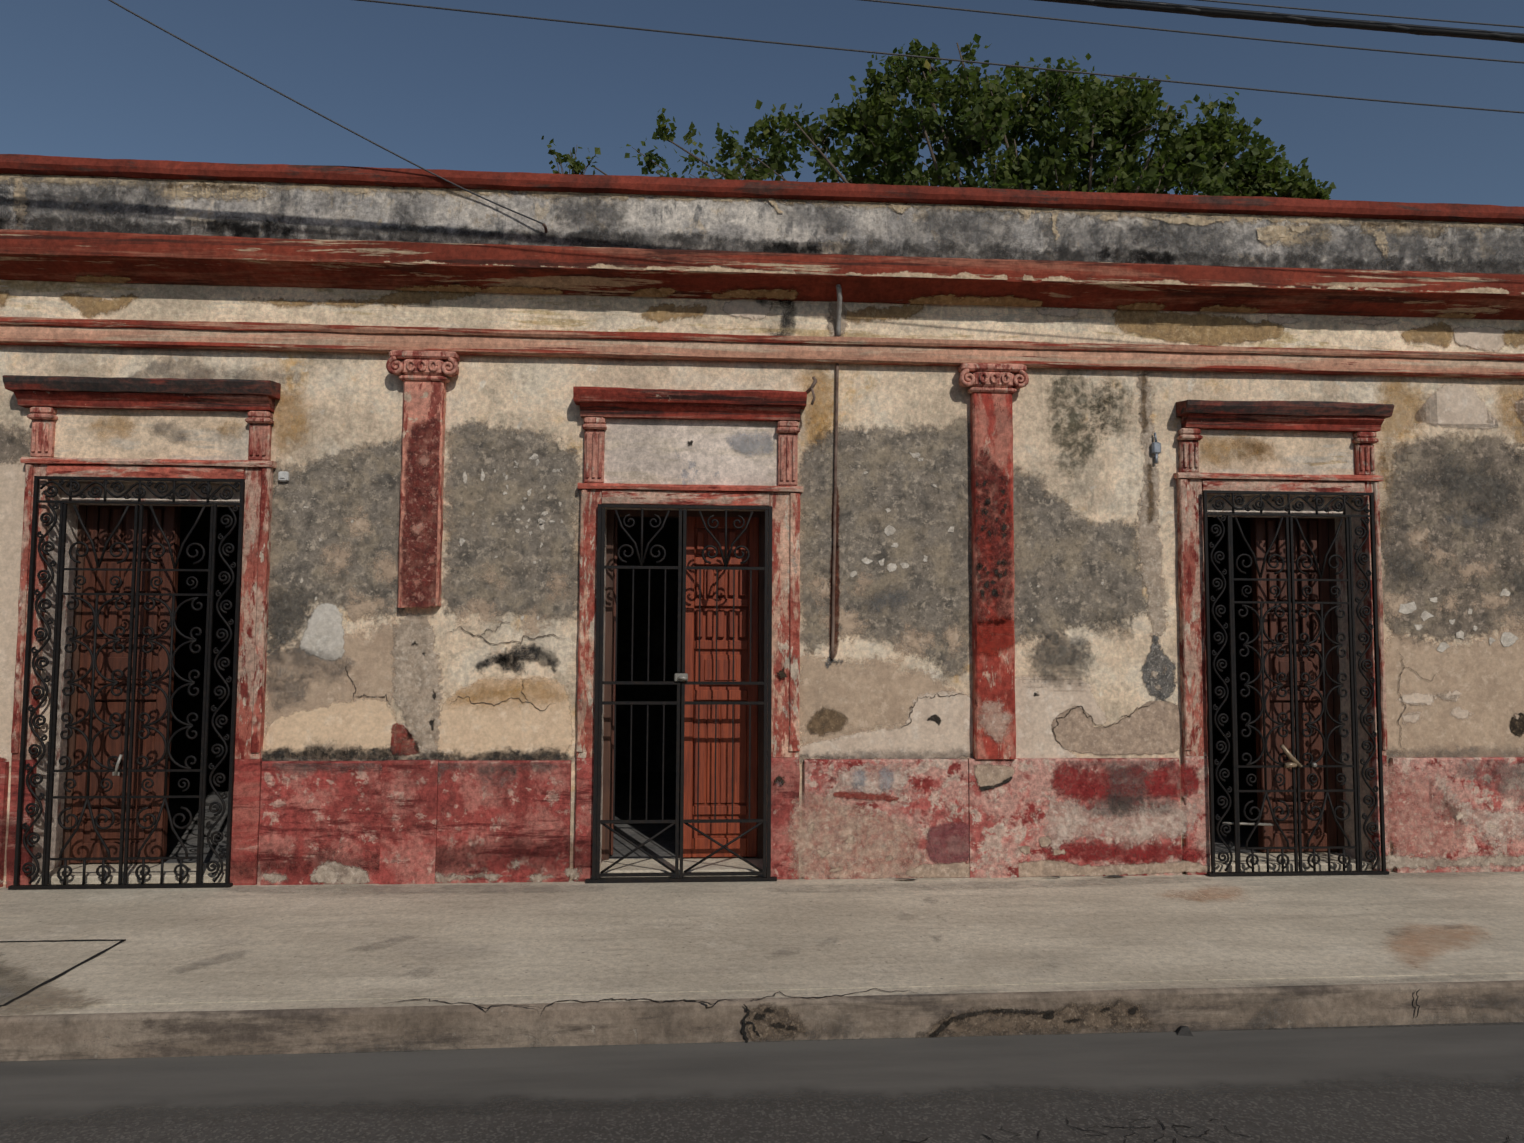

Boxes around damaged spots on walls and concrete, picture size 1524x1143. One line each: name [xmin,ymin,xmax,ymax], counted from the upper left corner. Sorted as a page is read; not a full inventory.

leakage [0,174,1524,274]
spalling [244,284,563,308]
spalling [642,265,799,323]
peeling [845,271,1083,323]
peeling [1103,279,1265,287]
spalling [1112,302,1284,346]
spalling [1341,313,1476,347]
spalling [1051,635,1182,756]
peeling [788,762,970,879]
peeling [1018,795,1211,877]
peeling [1372,763,1524,870]
spalling [917,998,1151,1038]